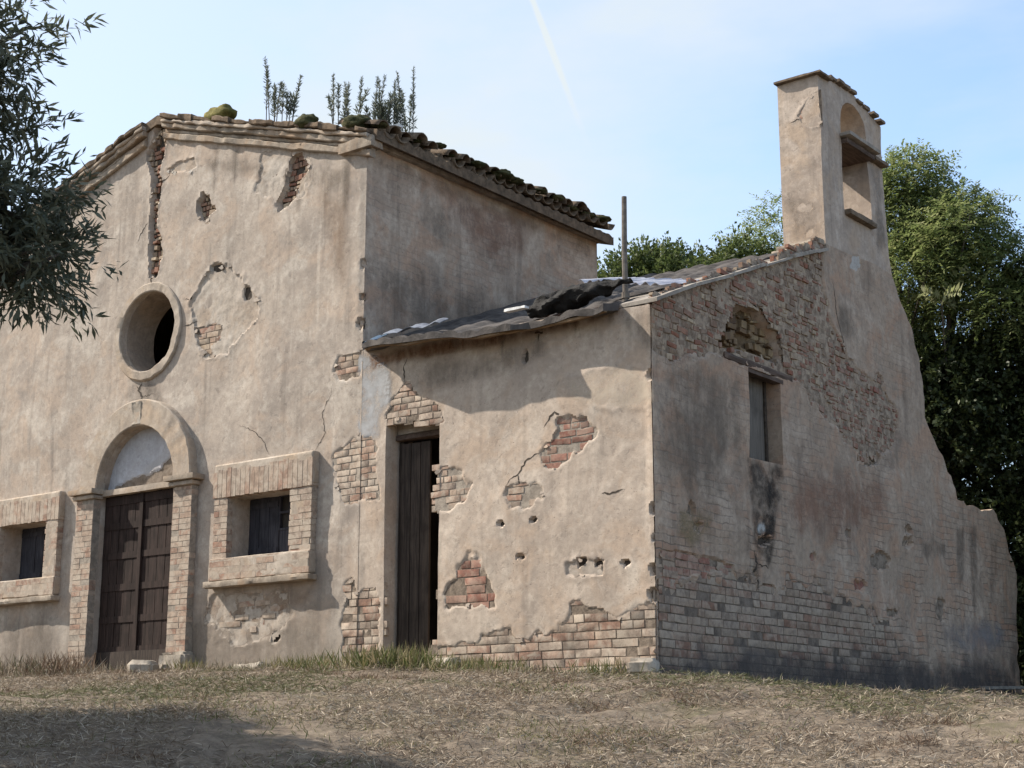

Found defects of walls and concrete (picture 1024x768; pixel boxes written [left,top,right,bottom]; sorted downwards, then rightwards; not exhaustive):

peeling [256,150,311,209]
peeling [183,264,260,360]
flaking render [648,236,898,466]
flaking render [385,381,444,428]
flaking render [332,432,380,505]
flaking render [431,464,472,514]
crack [505,452,541,487]
flaking render [541,416,598,470]
leakage [750,464,781,564]
flaking render [340,578,390,661]
flaking render [428,532,901,692]
leakage [736,650,1017,694]